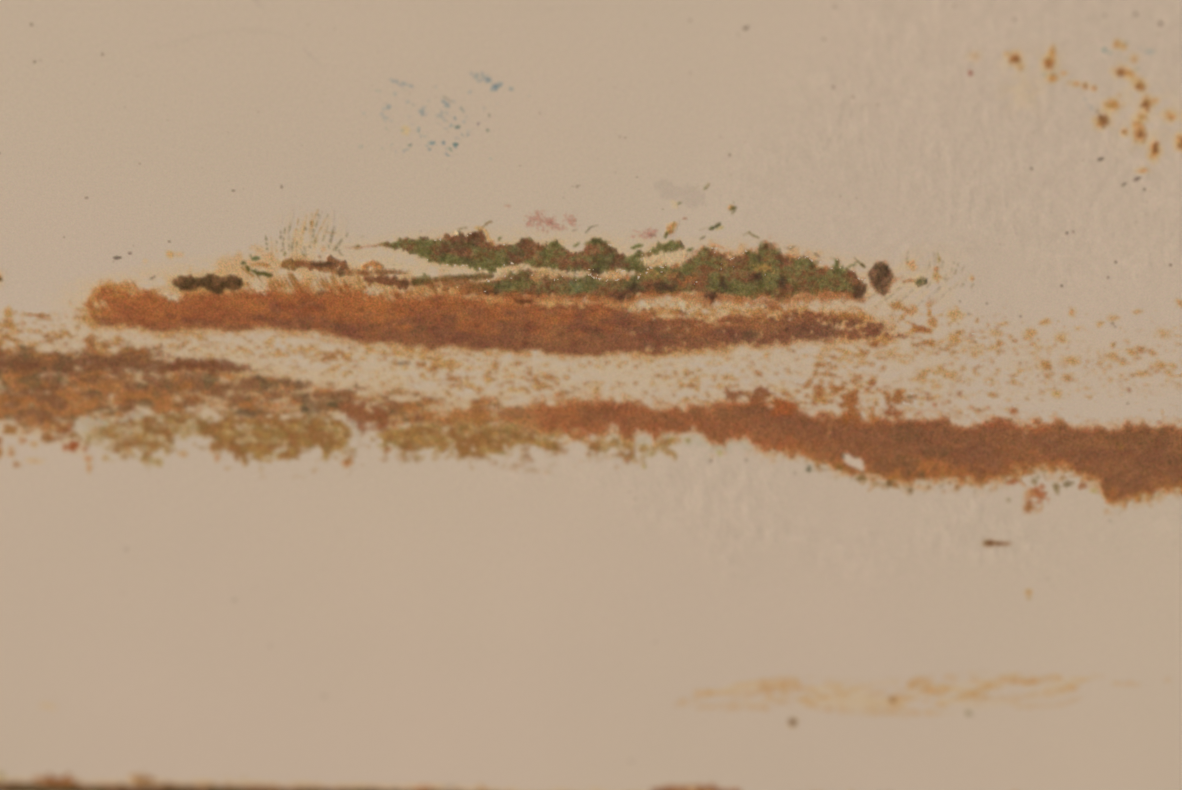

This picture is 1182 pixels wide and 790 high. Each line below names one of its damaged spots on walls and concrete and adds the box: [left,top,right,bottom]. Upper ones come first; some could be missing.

corrosion [964,37,1182,175]
corrosion [0,221,1182,521]
corrosion [31,771,77,789]
corrosion [649,781,742,790]